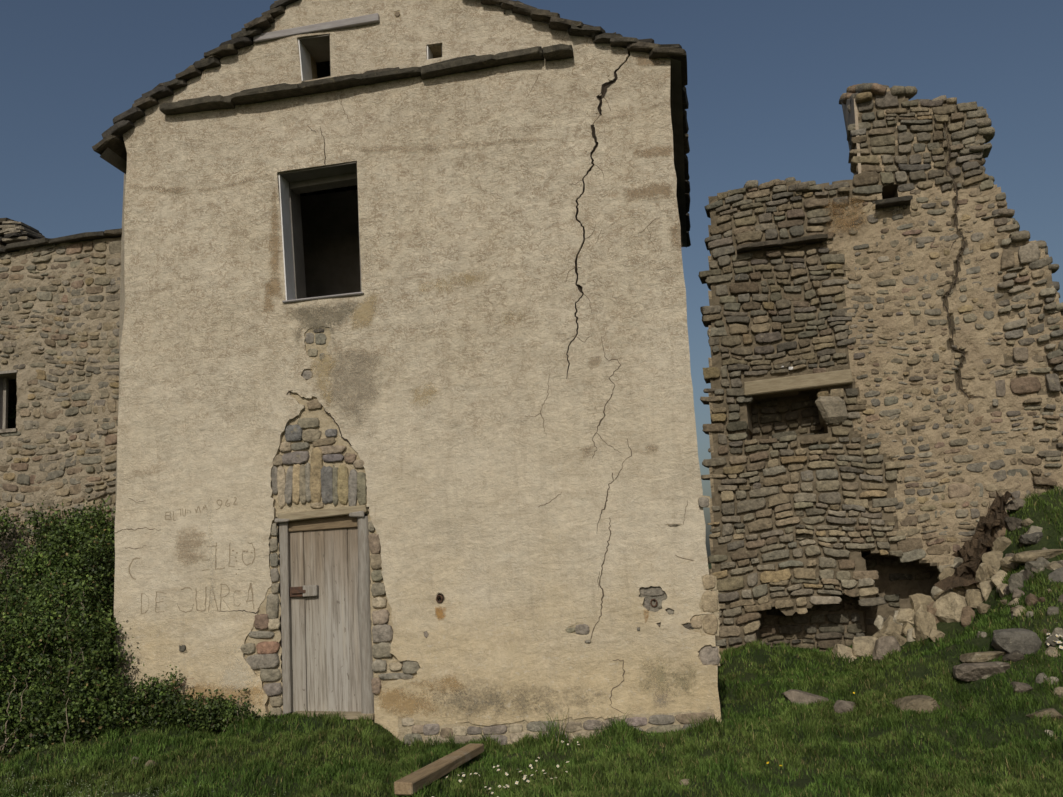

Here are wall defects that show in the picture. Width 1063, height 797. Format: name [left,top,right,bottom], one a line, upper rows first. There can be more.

spalling [302,326,331,380]
crack [526,54,632,640]
crack [943,123,987,398]
spalling [241,391,421,716]
spalling [639,586,674,627]
spalling [682,574,721,666]